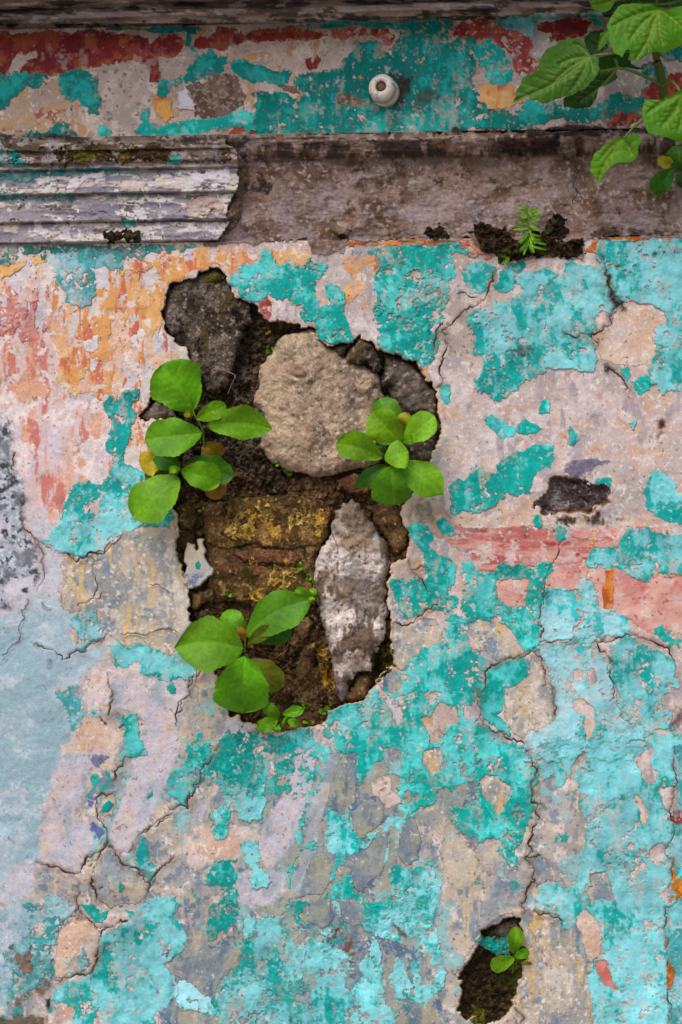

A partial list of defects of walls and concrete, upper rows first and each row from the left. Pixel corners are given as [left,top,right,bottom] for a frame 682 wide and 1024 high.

peeling [164,155,232,220]
peeling [0,11,682,203]
crack [433,273,494,383]
crack [565,257,629,390]
crack [175,671,201,725]
peeling [0,235,682,1024]
crack [477,549,569,922]
crack [46,758,212,982]